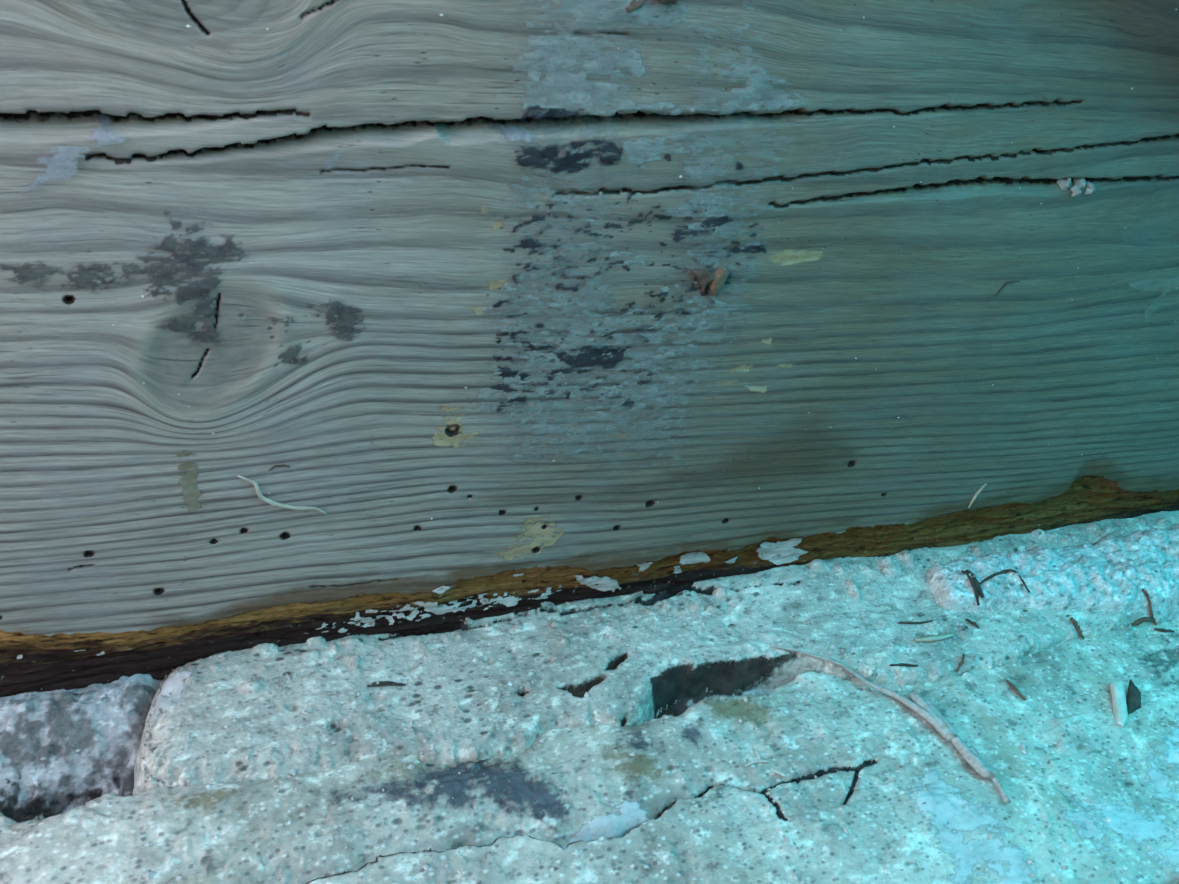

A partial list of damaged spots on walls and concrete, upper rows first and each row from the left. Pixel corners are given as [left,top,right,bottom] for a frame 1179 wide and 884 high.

crack [182,0,210,34]
peeling [513,0,804,117]
crack [0,100,1082,165]
crack [321,164,449,172]
crack [552,134,1179,208]
peeling [661,193,745,235]
peeling [769,249,824,266]
peeling [472,250,729,461]
peeling [495,515,564,561]
crack [460,581,801,631]
spalling [559,653,628,698]
crack [306,760,877,884]